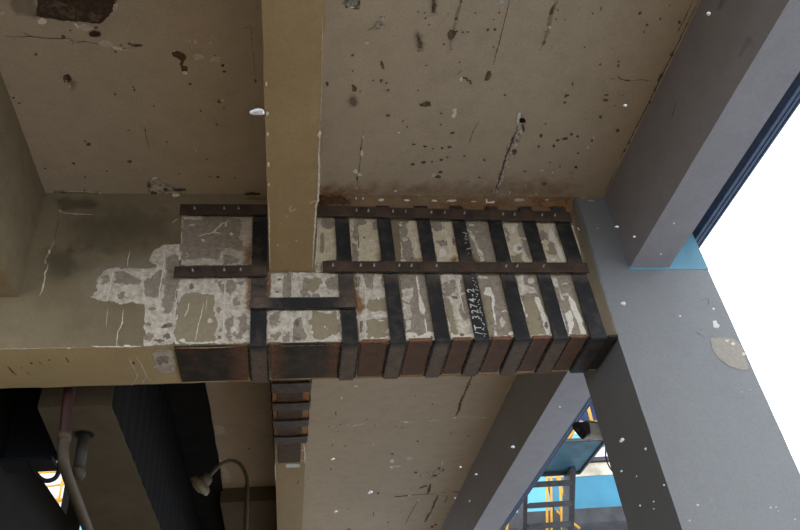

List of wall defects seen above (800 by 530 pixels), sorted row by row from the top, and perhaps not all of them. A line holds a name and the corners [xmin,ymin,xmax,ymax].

crack [5,26,143,53]
spalling [36,0,118,32]
crack [486,112,526,203]
rust [317,189,352,206]
crack [40,237,55,294]
peeling [711,320,748,370]